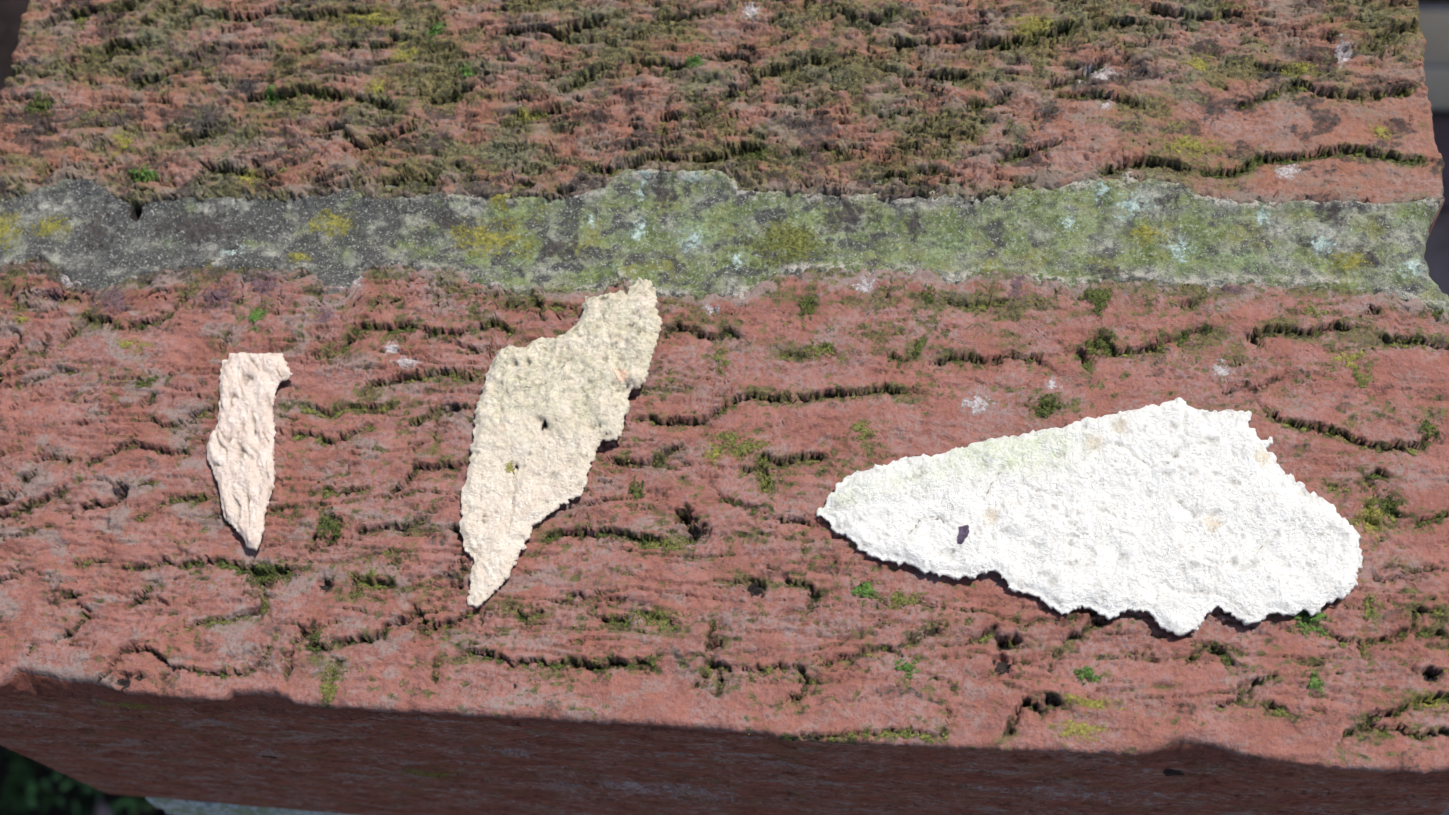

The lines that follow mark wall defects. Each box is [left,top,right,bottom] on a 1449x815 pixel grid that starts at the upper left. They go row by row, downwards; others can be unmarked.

flaking render [206,352,293,551]
flaking render [459,277,663,608]